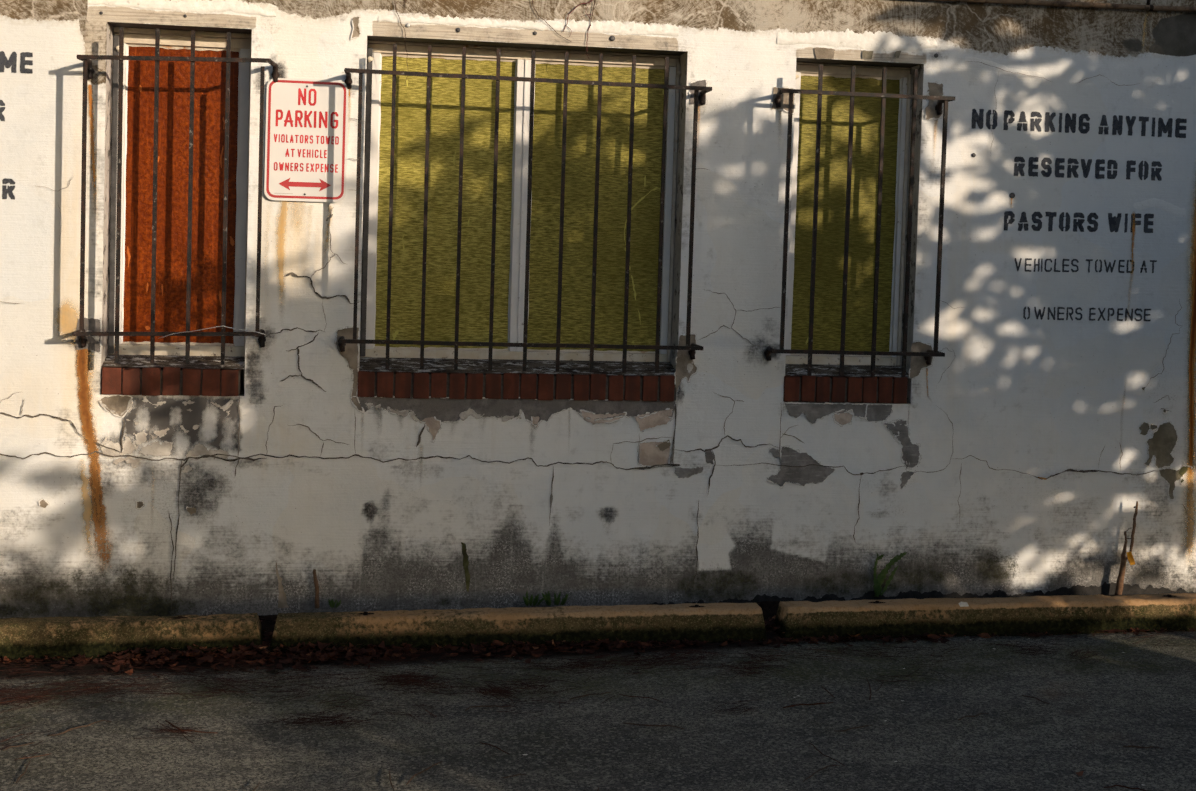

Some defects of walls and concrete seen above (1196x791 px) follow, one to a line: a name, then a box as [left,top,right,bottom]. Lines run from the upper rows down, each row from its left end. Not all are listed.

spalling [350,15,361,40]
spalling [814,47,835,59]
rust [57,304,77,334]
rust [76,349,111,565]
peeling [98,395,229,473]
spalling [335,326,714,478]
crack [0,190,1154,607]
spalling [767,446,834,489]
spalling [784,402,922,488]
spalling [1139,408,1193,501]
rust [1187,210,1196,552]
damp [646,582,1196,605]